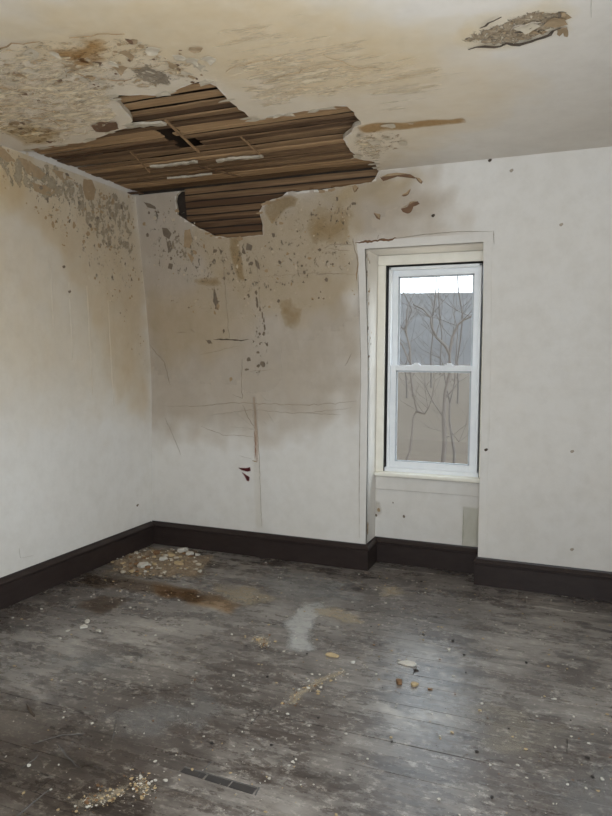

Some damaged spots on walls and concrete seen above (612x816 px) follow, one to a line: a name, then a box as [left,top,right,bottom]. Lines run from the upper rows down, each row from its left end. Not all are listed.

spalling [465,11,572,50]
damp [0,33,216,143]
spalling [0,80,423,325]
damp [245,290,268,371]